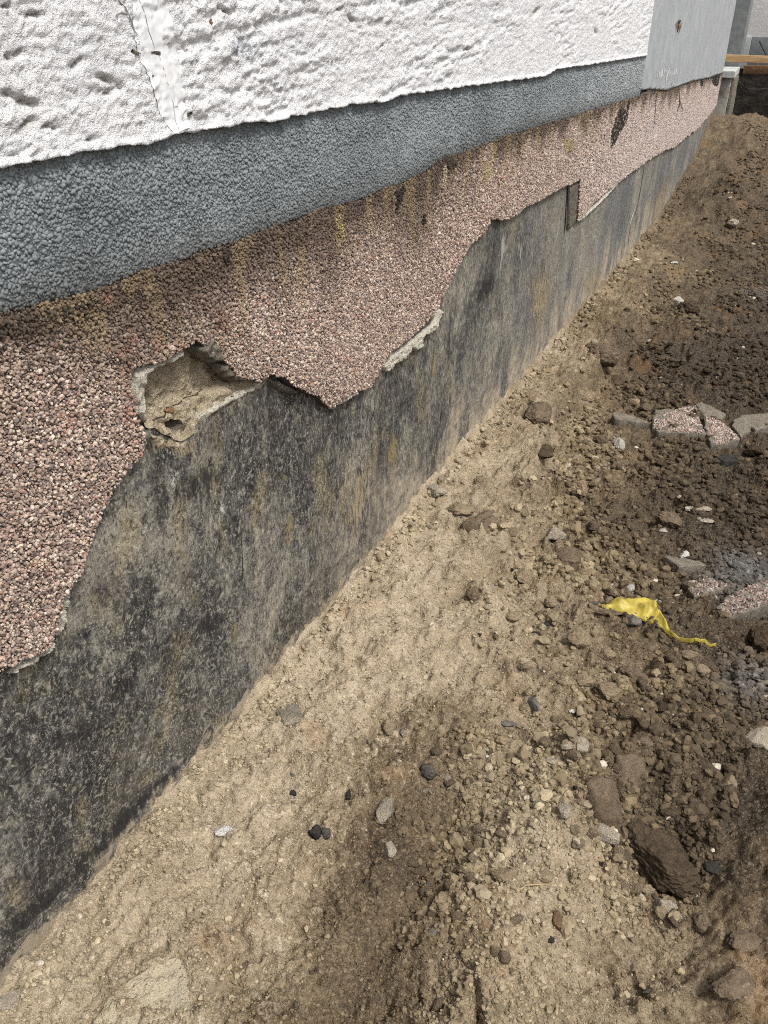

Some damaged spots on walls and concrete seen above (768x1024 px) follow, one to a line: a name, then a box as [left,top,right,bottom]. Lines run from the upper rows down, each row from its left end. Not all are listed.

damp [611,98,630,149]
spalling [382,309,444,372]
spalling [130,338,299,451]
spalling [7,593,71,674]